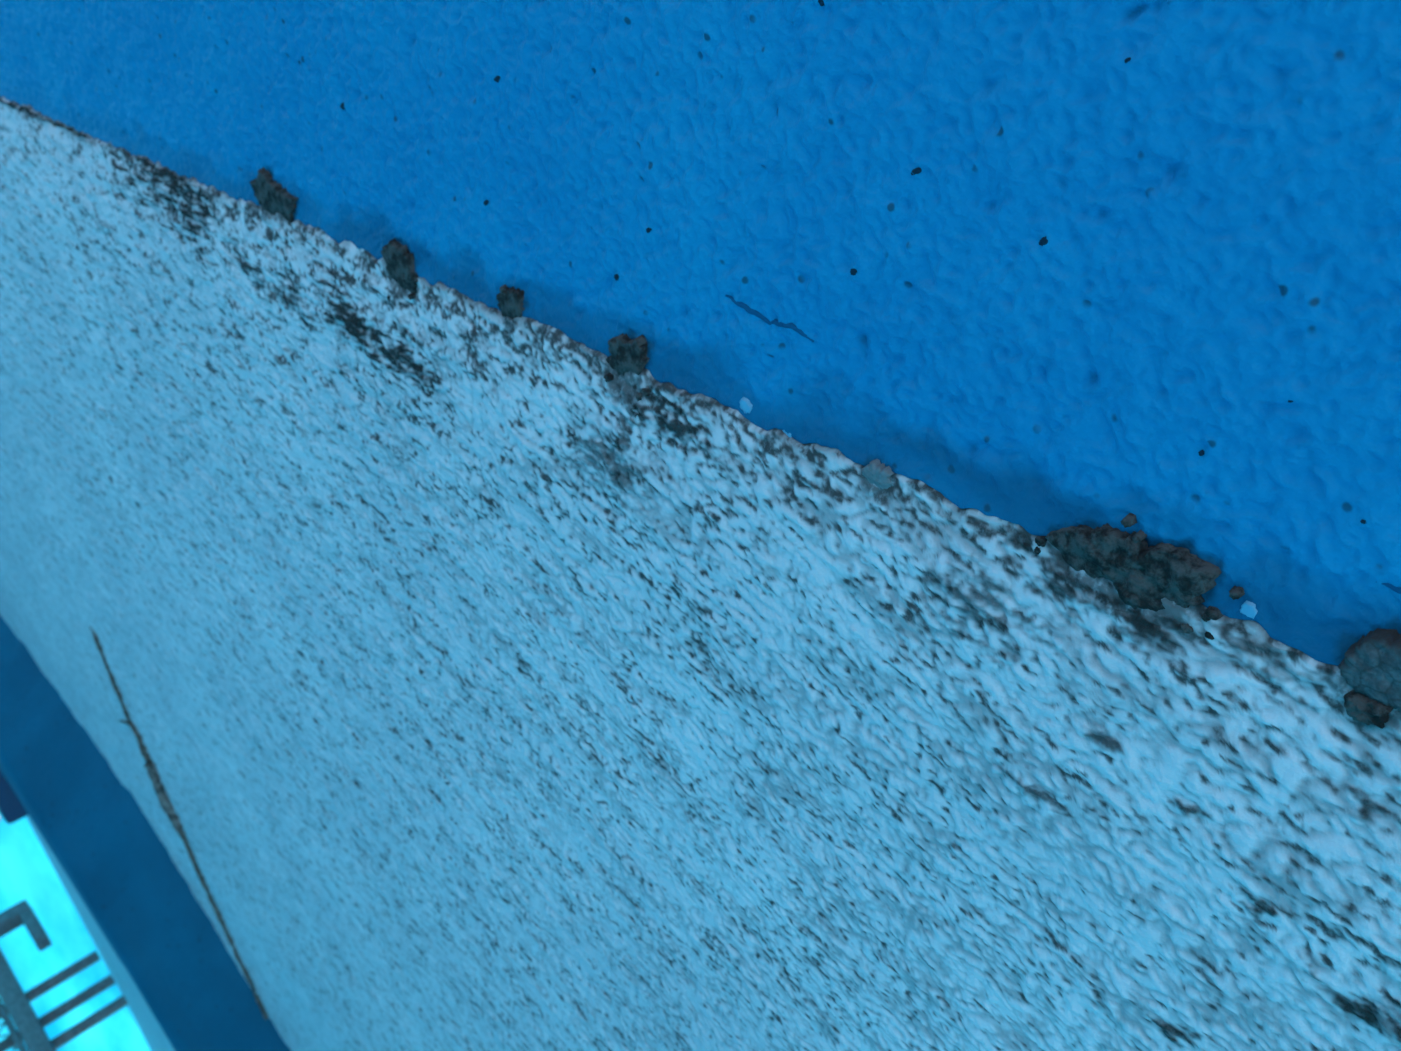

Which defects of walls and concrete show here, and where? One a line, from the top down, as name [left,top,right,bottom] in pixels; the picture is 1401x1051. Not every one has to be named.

leakage [0,98,90,139]
leakage [108,153,219,252]
leakage [233,243,441,406]
leakage [627,394,715,450]
leakage [922,576,1002,627]
leakage [1085,733,1122,752]
crack [89,626,268,1020]
leakage [1170,800,1210,818]
leakage [1349,787,1401,824]
leakage [1240,888,1277,917]
leakage [1152,1020,1199,1045]
leakage [1334,994,1401,1042]